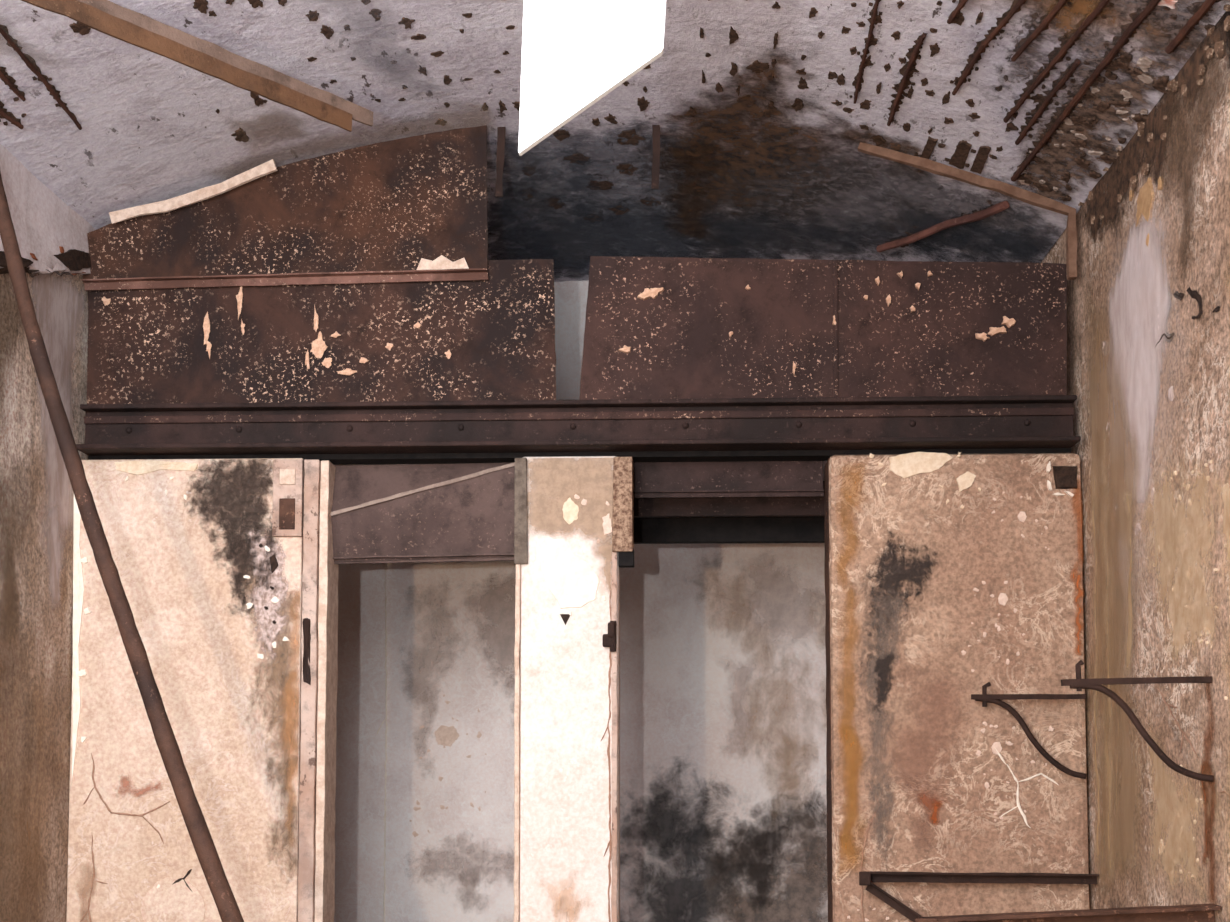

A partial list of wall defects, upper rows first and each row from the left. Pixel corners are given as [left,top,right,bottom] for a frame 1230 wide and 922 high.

spalling [0,24,82,130]
spalling [193,0,263,17]
spalling [306,10,351,39]
spalling [398,17,426,40]
leakage [1163,40,1230,264]
flaking render [828,0,1230,509]
peeling [939,471,1049,550]
leakage [0,488,71,922]
leakage [189,459,300,870]
leakage [874,654,894,708]
rust [840,675,860,865]
leakage [747,826,827,906]